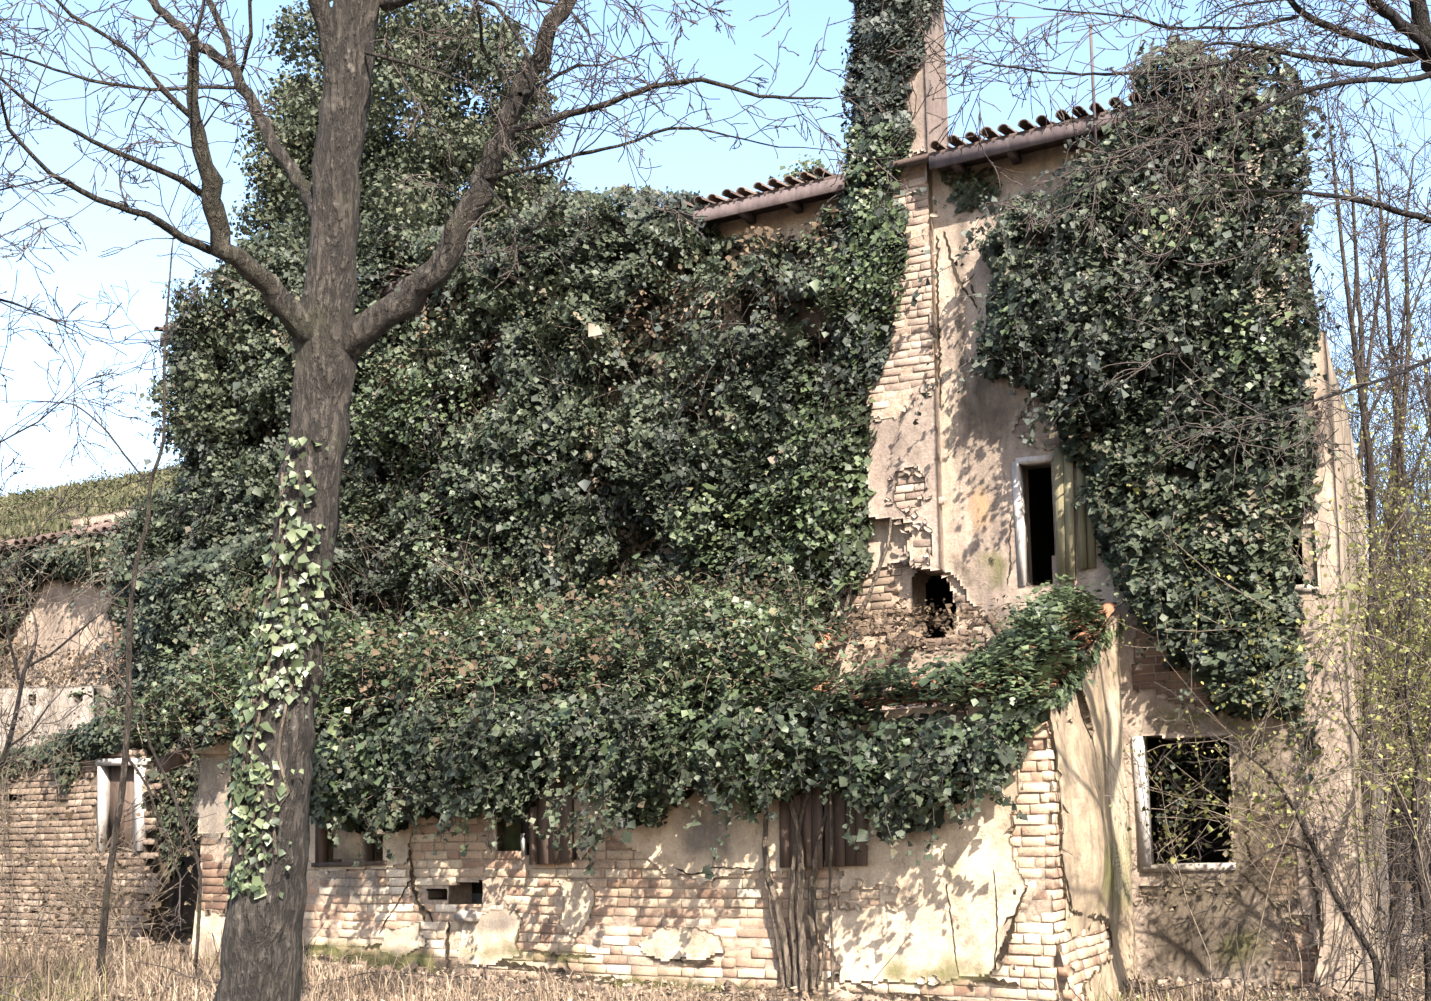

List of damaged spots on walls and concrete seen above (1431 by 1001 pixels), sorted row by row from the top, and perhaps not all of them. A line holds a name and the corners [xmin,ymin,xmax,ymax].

spalling [864,147,941,422]
spalling [852,463,945,651]
spalling [918,589,987,653]
crack [302,850,451,970]
spalling [302,718,1114,1001]